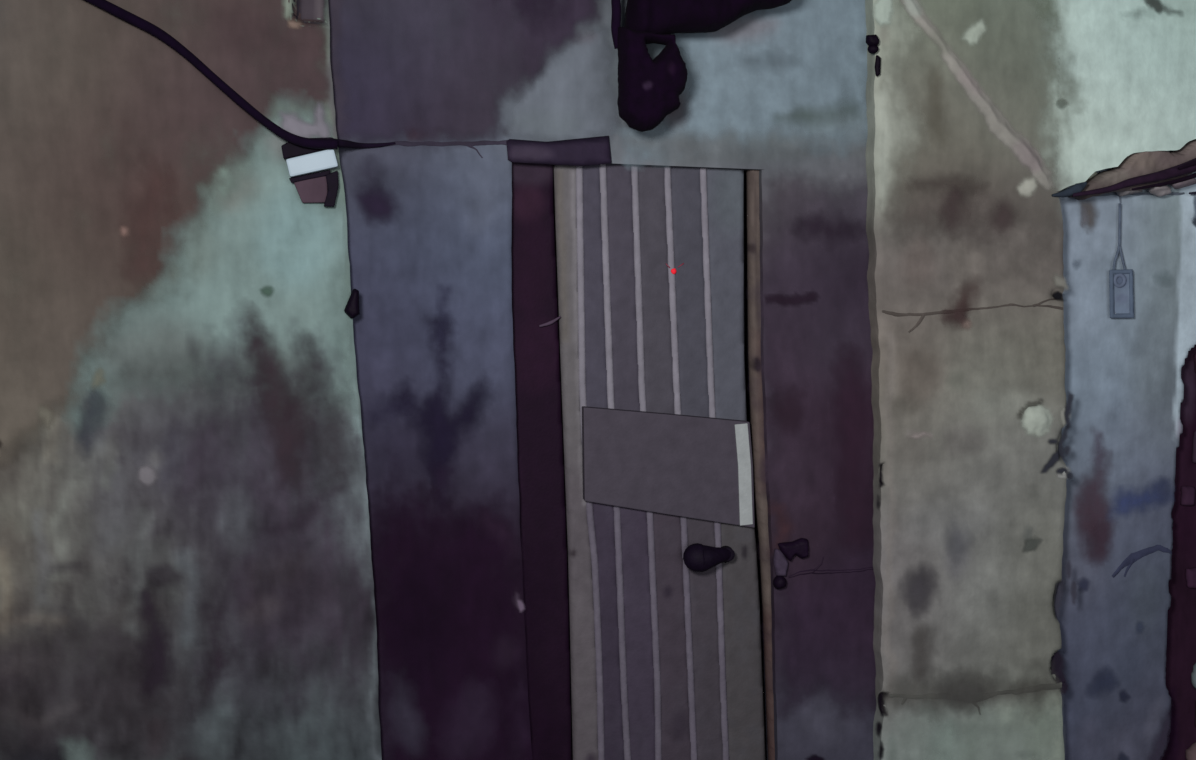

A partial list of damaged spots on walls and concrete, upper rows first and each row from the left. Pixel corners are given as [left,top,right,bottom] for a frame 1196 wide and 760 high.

spalling [963,20,985,44]
water stain [0,0,597,464]
crack [882,298,1063,333]
water stain [184,337,370,651]
rust [1077,454,1109,556]
crack [1112,545,1172,578]